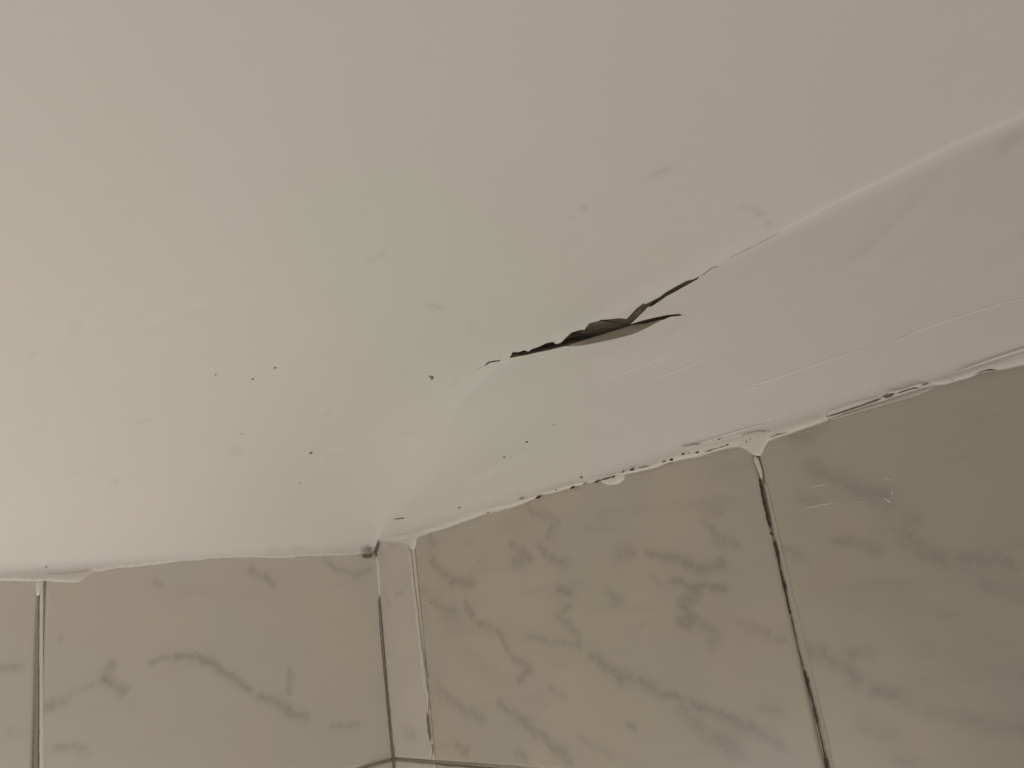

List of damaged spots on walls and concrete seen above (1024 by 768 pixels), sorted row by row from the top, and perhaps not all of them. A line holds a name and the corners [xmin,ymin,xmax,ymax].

crack [485,266,717,365]